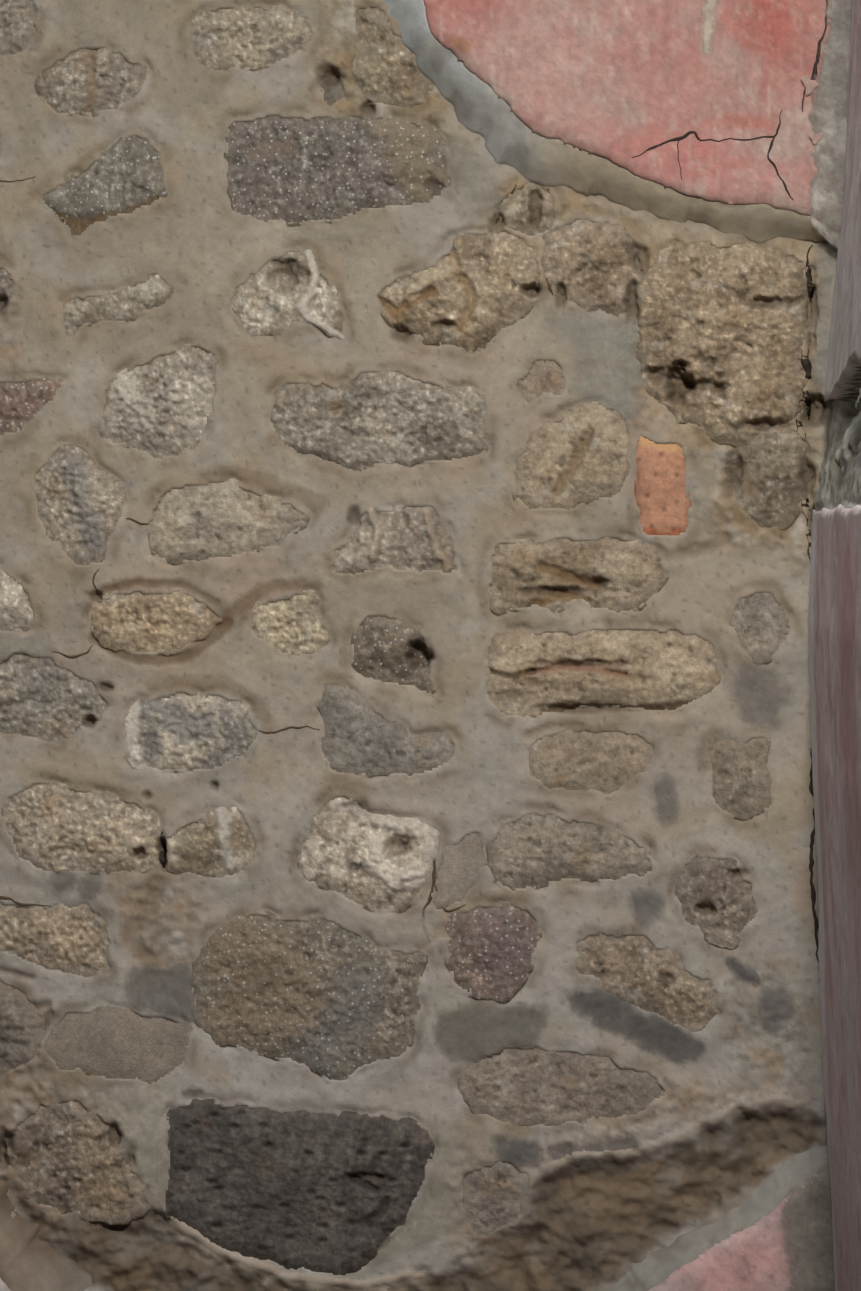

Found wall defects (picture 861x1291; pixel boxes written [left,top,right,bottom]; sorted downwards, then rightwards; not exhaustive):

spalling [383,0,828,244]
crack [632,0,828,200]
peeling [801,0,852,248]
spalling [813,367,861,511]
spalling [0,1180,93,1291]
spalling [593,1146,835,1291]